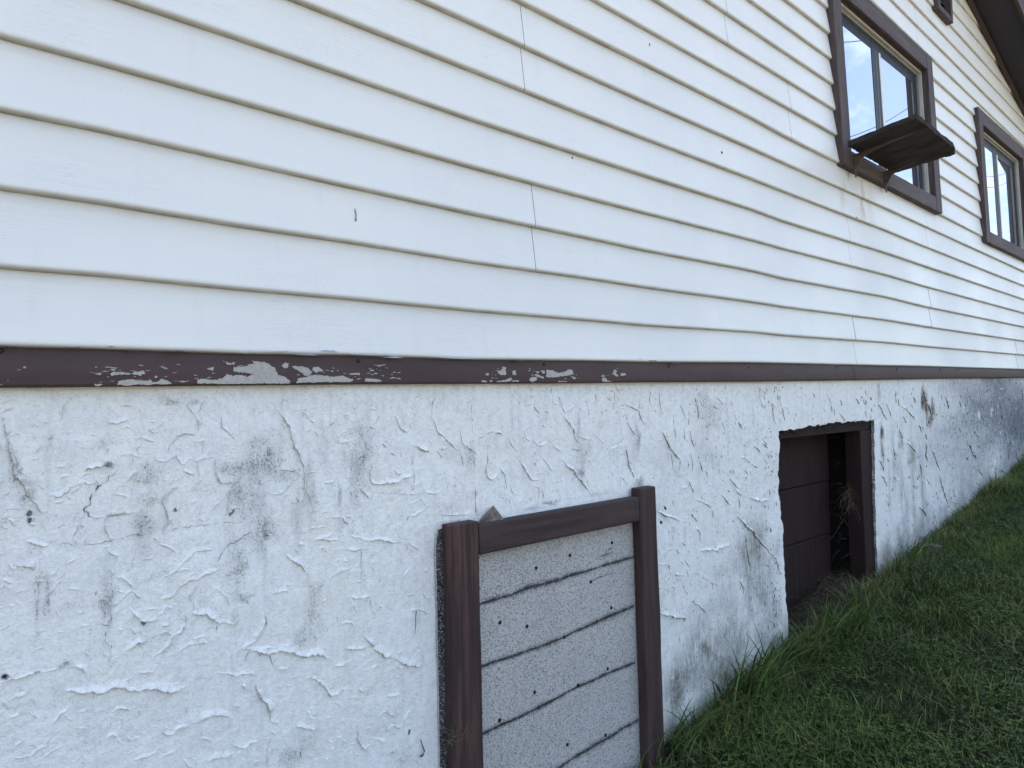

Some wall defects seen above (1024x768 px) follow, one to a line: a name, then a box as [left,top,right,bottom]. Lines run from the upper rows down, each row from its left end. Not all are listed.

peeling [90,350,404,386]
peeling [482,360,577,383]